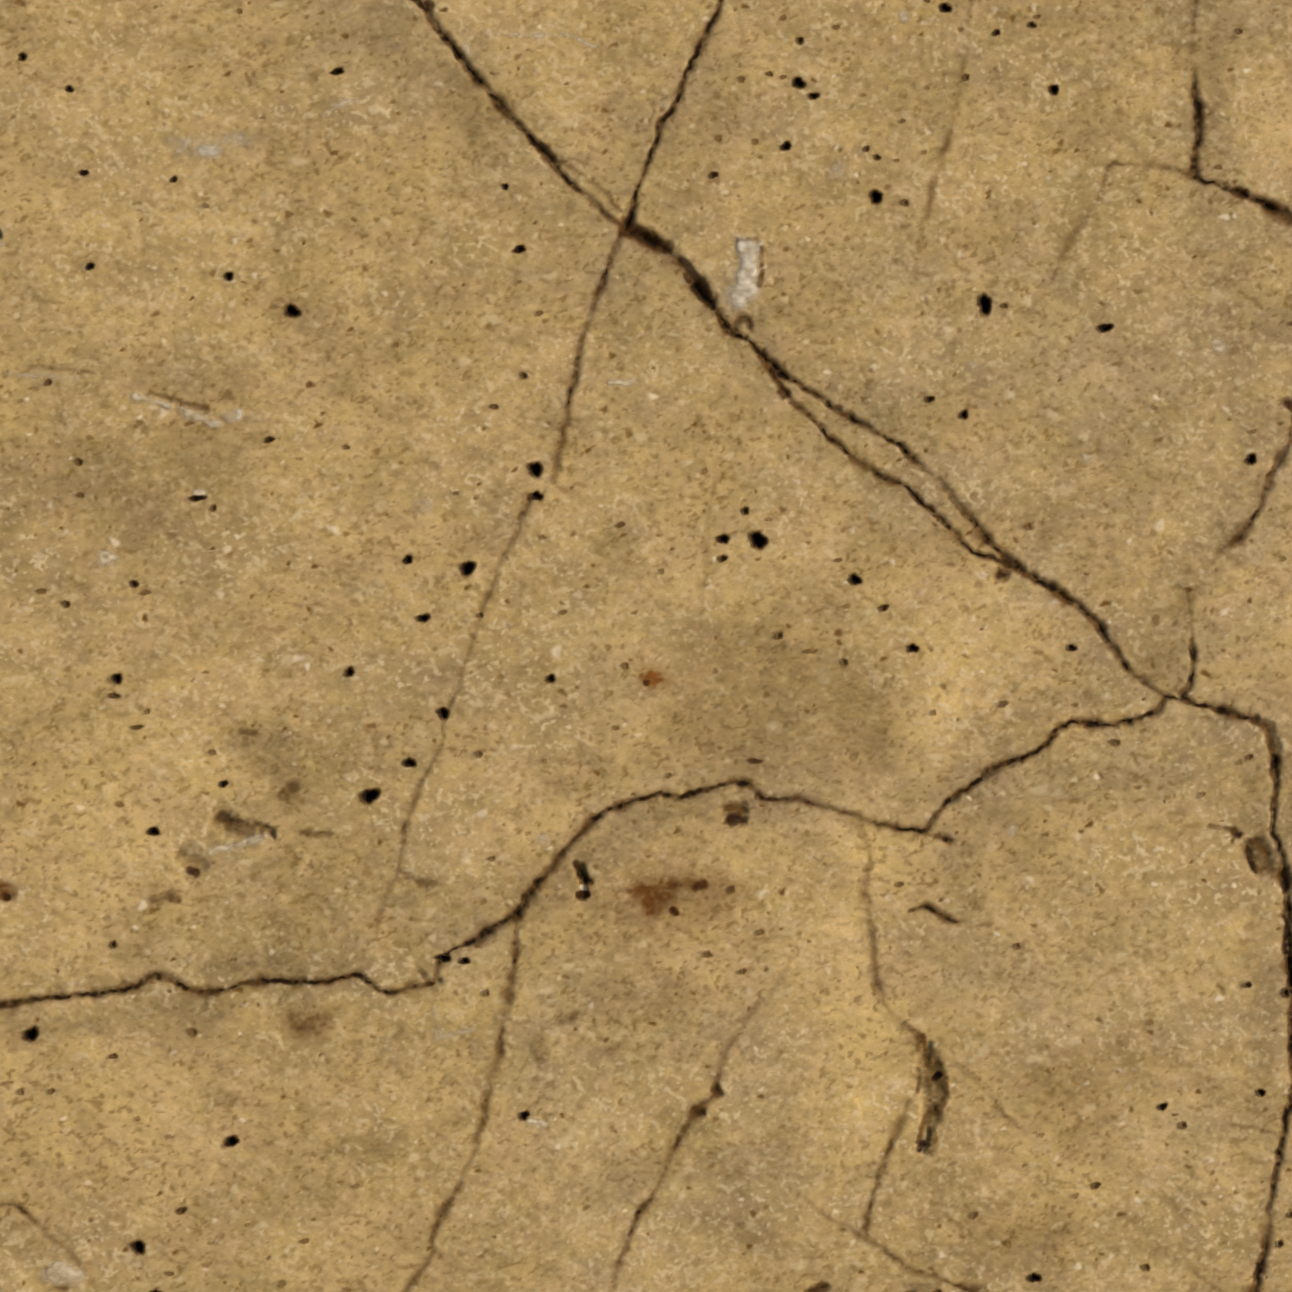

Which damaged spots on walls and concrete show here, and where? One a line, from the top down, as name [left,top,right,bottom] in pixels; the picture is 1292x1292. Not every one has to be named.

crack [413,0,583,194]
crack [555,335,584,463]
crack [591,0,1292,1214]
crack [0,779,858,1009]
rust [626,880,707,916]
crack [496,1028,504,1056]
crack [474,1099,487,1141]
crack [431,1187,458,1241]
crack [617,1193,654,1266]
crack [862,1123,900,1259]
crack [947,1281,979,1292]
crack [1248,1234,1270,1292]